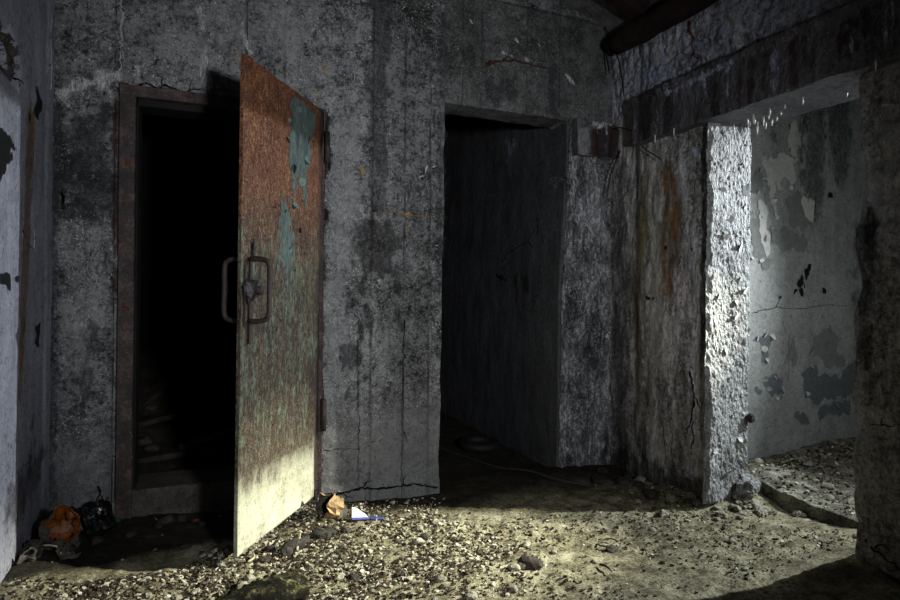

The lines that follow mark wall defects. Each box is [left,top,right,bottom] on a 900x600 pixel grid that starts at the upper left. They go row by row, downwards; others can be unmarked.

spalling [0,18,25,81]
peeling [28,86,43,121]
peeling [0,128,15,182]
rust [110,98,131,292]
peeling [0,272,19,291]
crack [323,320,438,498]
crack [663,372,702,455]
spalling [702,120,815,504]
crack [753,294,854,378]
peeling [787,328,856,425]